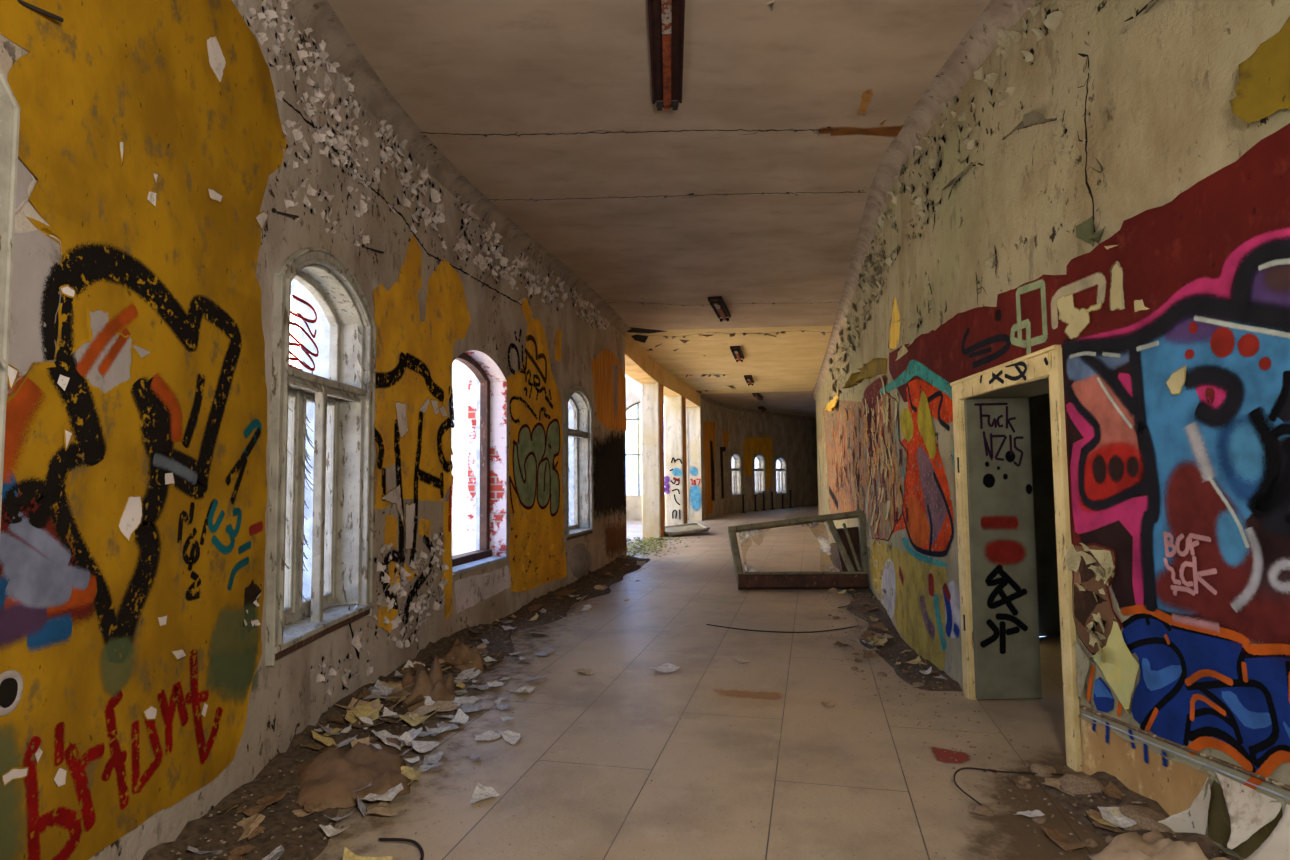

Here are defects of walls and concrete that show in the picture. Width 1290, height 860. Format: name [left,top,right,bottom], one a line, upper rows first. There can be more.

crack [1120,0,1159,34]
crack [1076,53,1106,247]
peeling [823,0,1067,601]
peeling [1056,242,1151,339]
peeling [1165,365,1187,395]